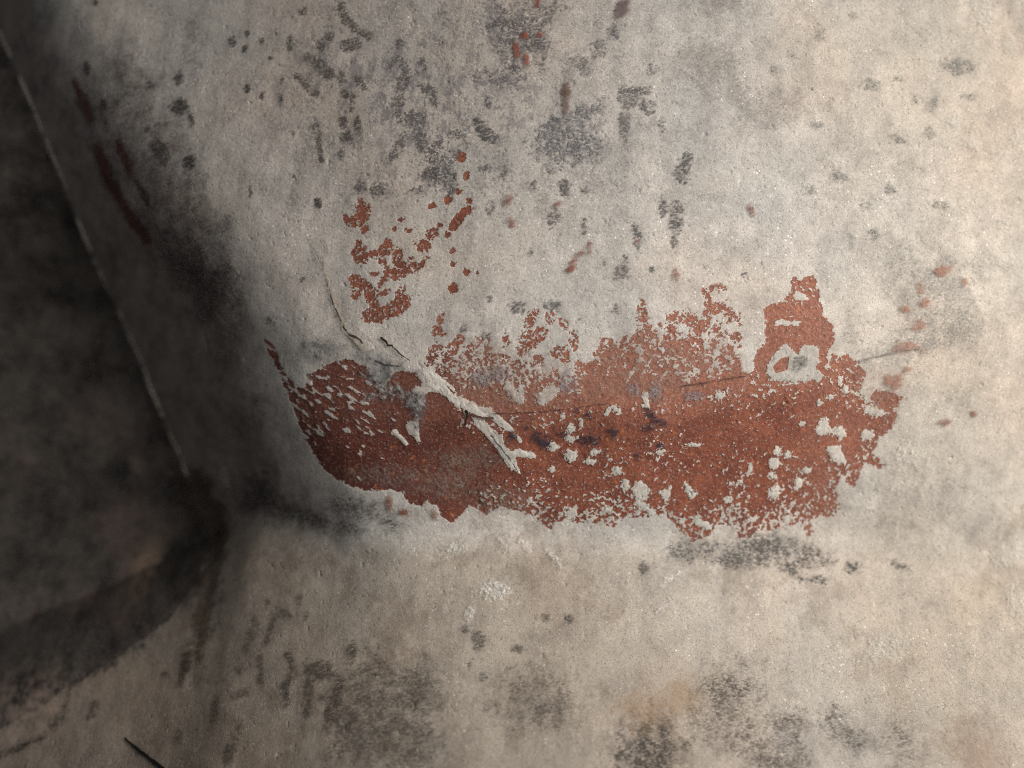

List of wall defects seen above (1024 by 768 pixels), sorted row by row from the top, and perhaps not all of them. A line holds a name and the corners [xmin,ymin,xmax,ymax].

leakage [83,56,243,339]
leakage [304,2,372,160]
leakage [386,32,500,197]
leakage [474,0,568,90]
leakage [524,100,604,196]
leakage [617,84,666,141]
leakage [659,194,685,248]
crack [317,238,410,367]
peeling [264,275,910,542]
leakage [666,532,858,583]
leakage [280,640,446,768]
leakage [689,663,811,768]